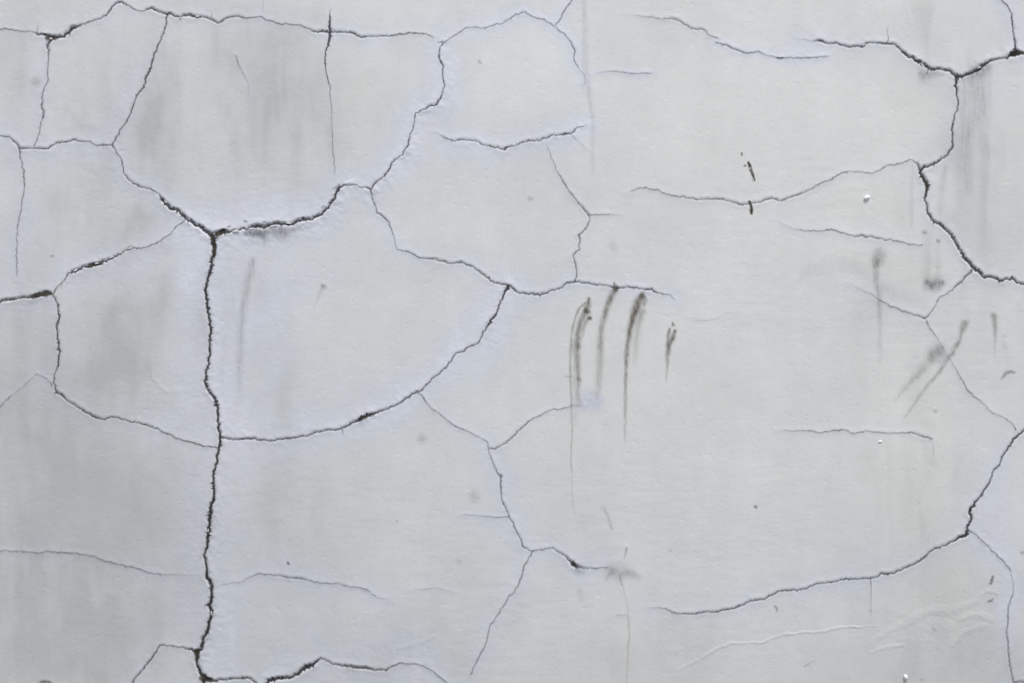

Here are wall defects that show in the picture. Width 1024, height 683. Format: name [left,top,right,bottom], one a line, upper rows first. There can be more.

crack [0,1,657,683]
water stain [627,293,643,342]
crack [817,4,1024,319]
crack [665,418,1024,614]